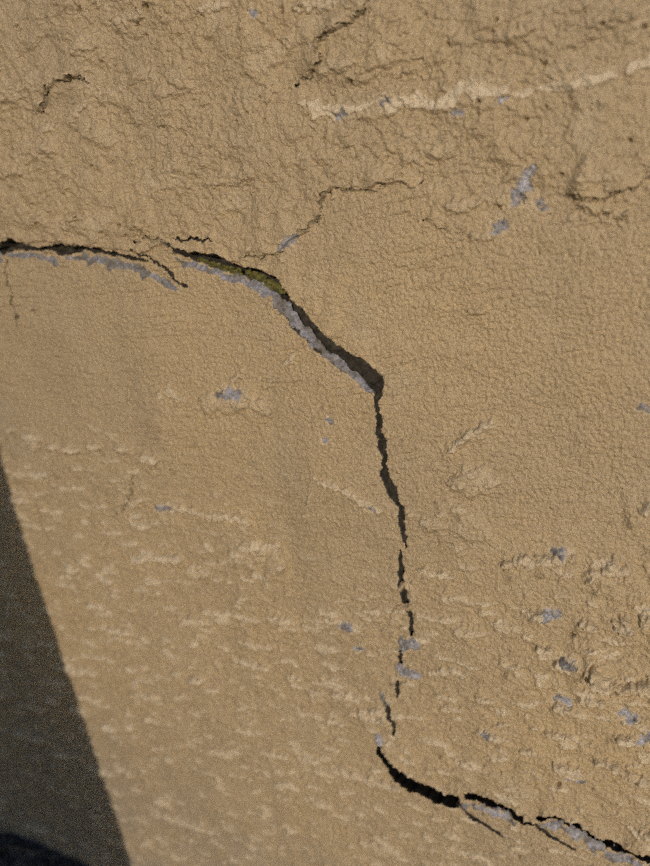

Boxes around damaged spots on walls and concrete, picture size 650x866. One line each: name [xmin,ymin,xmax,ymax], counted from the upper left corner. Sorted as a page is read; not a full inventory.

crack [0,175,650,866]